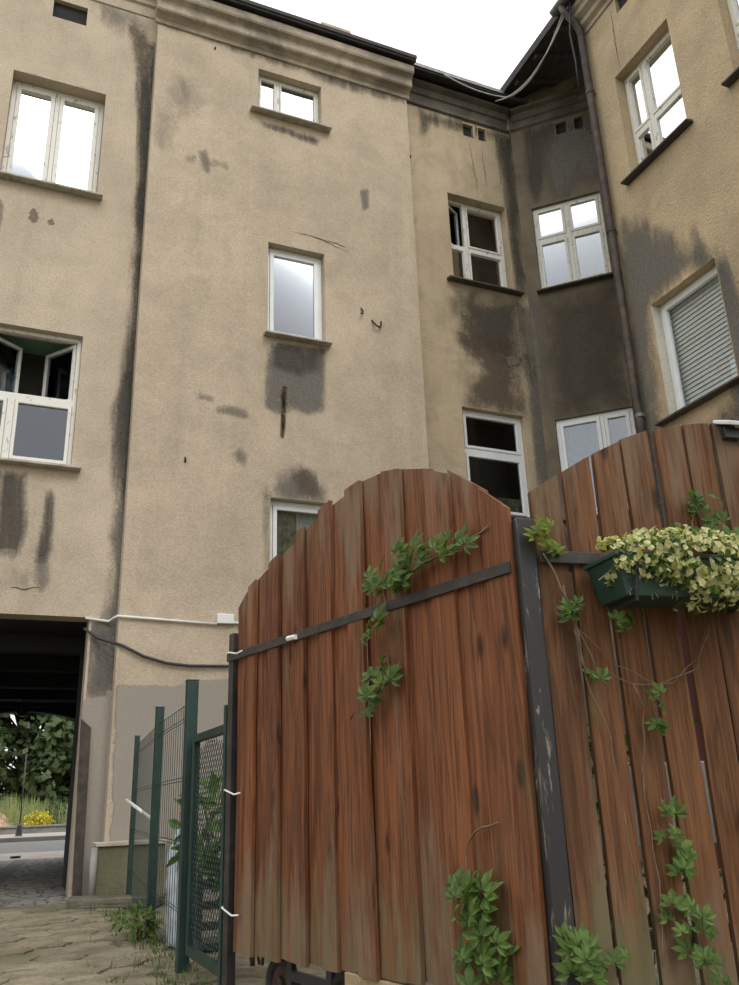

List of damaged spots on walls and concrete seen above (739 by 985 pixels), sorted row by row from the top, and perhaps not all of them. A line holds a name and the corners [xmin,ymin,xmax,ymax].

leakage [87,9,155,695]
leakage [266,344,324,413]
leakage [459,222,707,542]
leakage [717,267,739,428]
leakage [0,474,24,556]
leakage [38,495,53,586]
leakage [276,470,322,501]